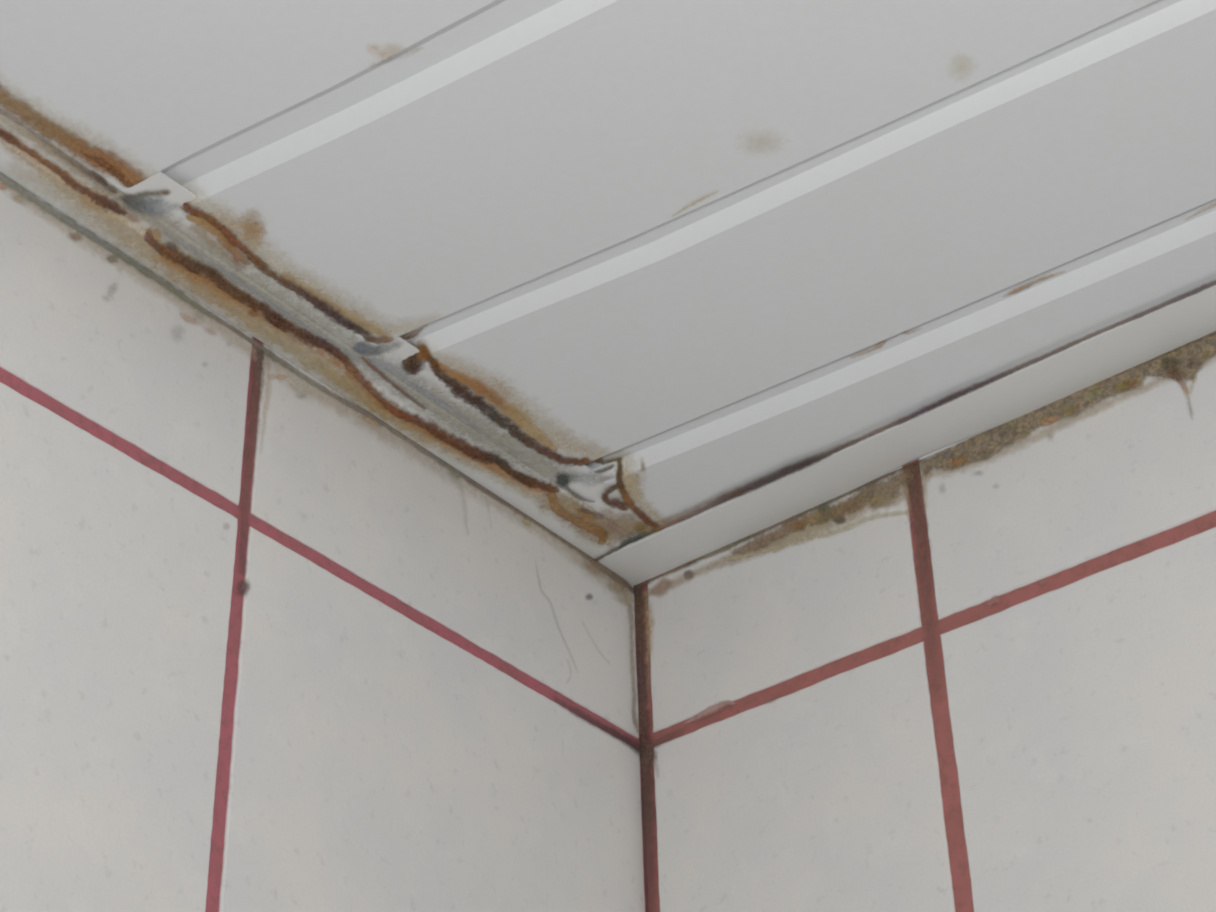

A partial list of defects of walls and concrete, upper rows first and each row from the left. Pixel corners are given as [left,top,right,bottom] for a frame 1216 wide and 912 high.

corrosion [0,87,664,562]
damp [0,172,1216,593]